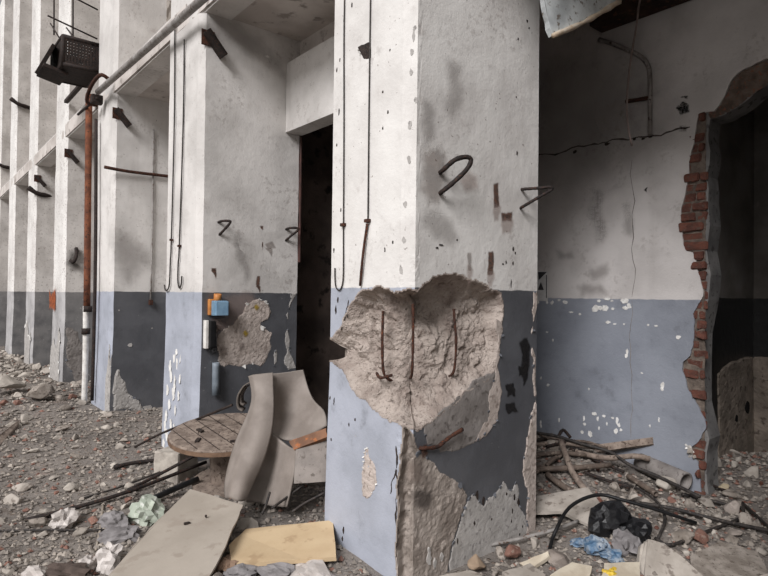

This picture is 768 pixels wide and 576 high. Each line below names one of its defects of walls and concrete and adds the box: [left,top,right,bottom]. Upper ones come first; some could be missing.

crack [538,127,690,156]
rust [494,183,512,221]
peeling [217,298,296,370]
peeling [592,298,631,312]
flaking render [678,59,768,495]
peeling [105,344,152,411]
peeling [162,349,181,448]
spalling [329,272,592,576]
peeling [580,412,622,437]